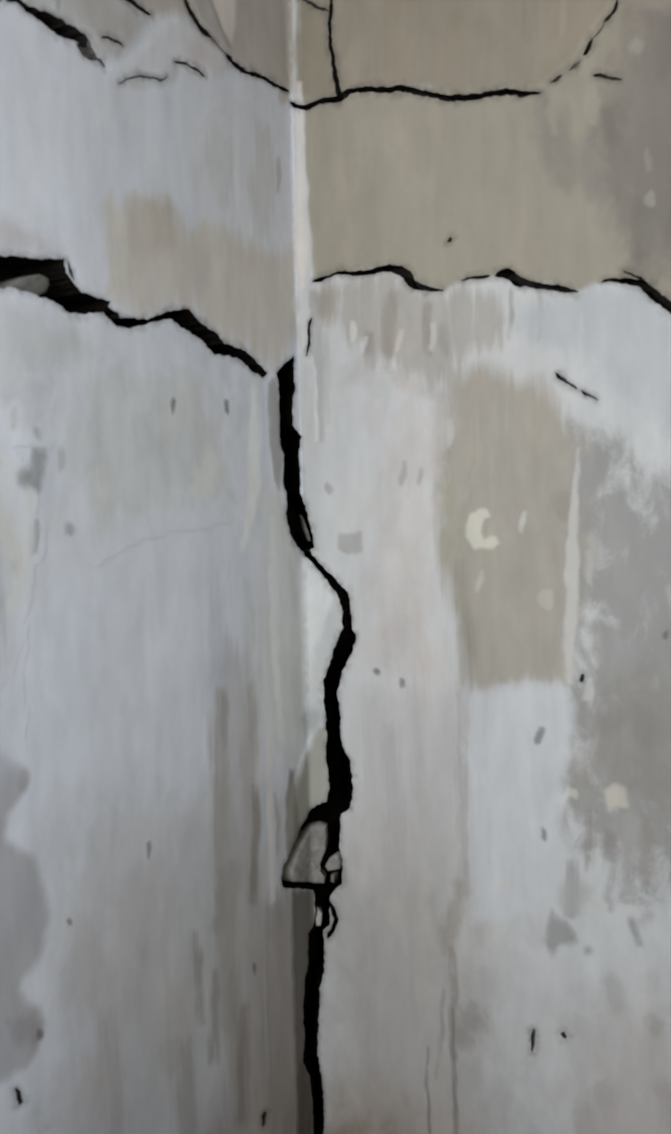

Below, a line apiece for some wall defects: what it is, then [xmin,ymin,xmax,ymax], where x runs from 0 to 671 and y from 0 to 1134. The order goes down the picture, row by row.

crack [0,0,205,84]
crack [184,0,622,110]
crack [312,264,671,314]
crack [555,373,598,401]
water stain [0,101,343,1134]
crack [0,255,356,1134]
water stain [294,263,671,1134]